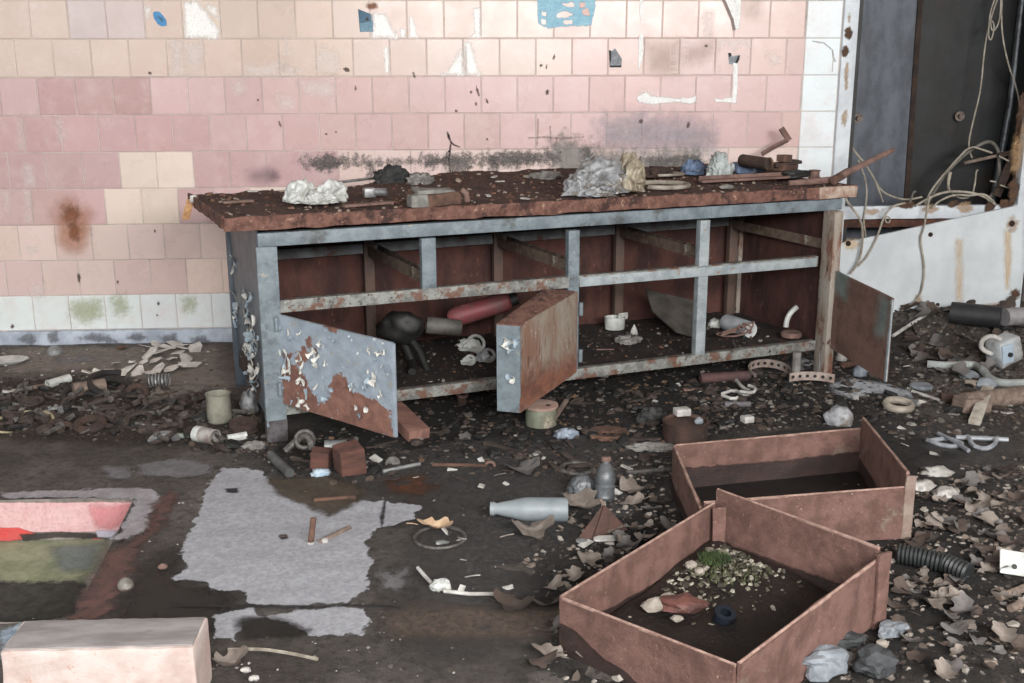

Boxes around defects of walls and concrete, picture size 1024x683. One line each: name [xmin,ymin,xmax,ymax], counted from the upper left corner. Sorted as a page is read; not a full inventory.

peeling [184,0,219,39]
peeling [358,3,418,73]
peeling [442,8,488,105]
damp [302,138,622,177]
damp [640,150,700,167]
corrosion [62,207,83,247]
corrosion [1006,222,1020,297]